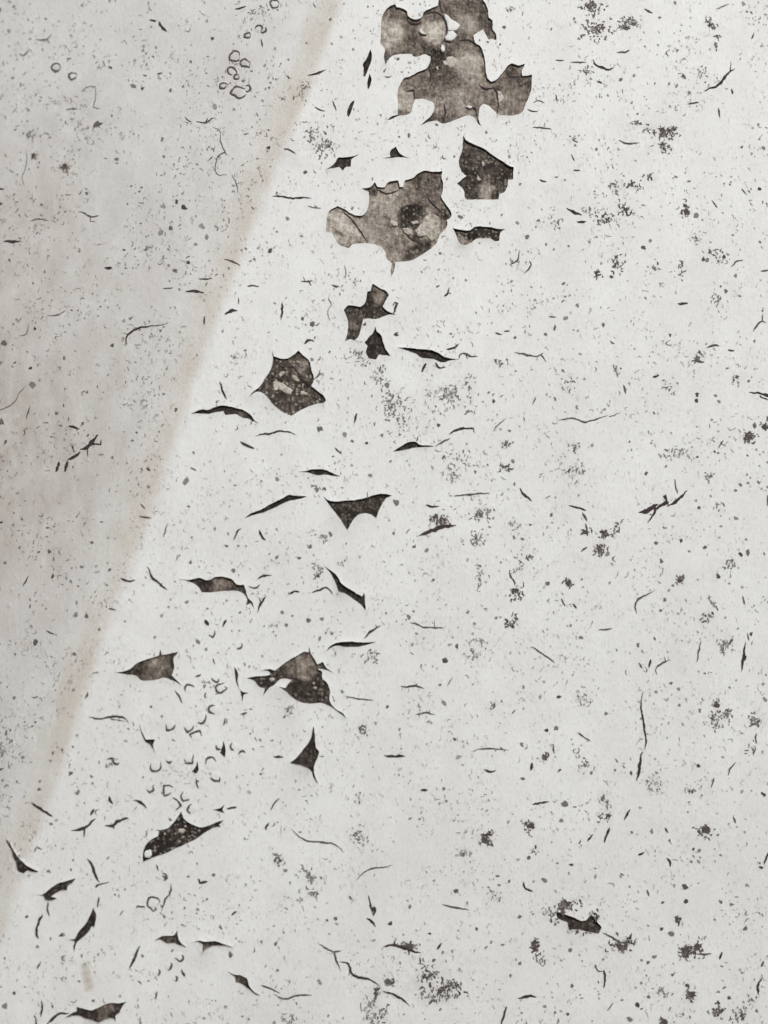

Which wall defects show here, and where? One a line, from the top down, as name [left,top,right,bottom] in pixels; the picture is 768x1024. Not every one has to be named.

peeling [363,0,532,126]
peeling [457,136,514,200]
peeling [326,171,504,276]
peeling [344,284,457,362]
peeling [250,351,326,416]
peeling [323,494,392,530]
spalling [180,576,254,608]
peeling [115,650,181,685]
peeling [234,647,346,718]
peeling [291,726,319,784]
peeling [142,806,224,862]
peeling [65,1002,126,1024]